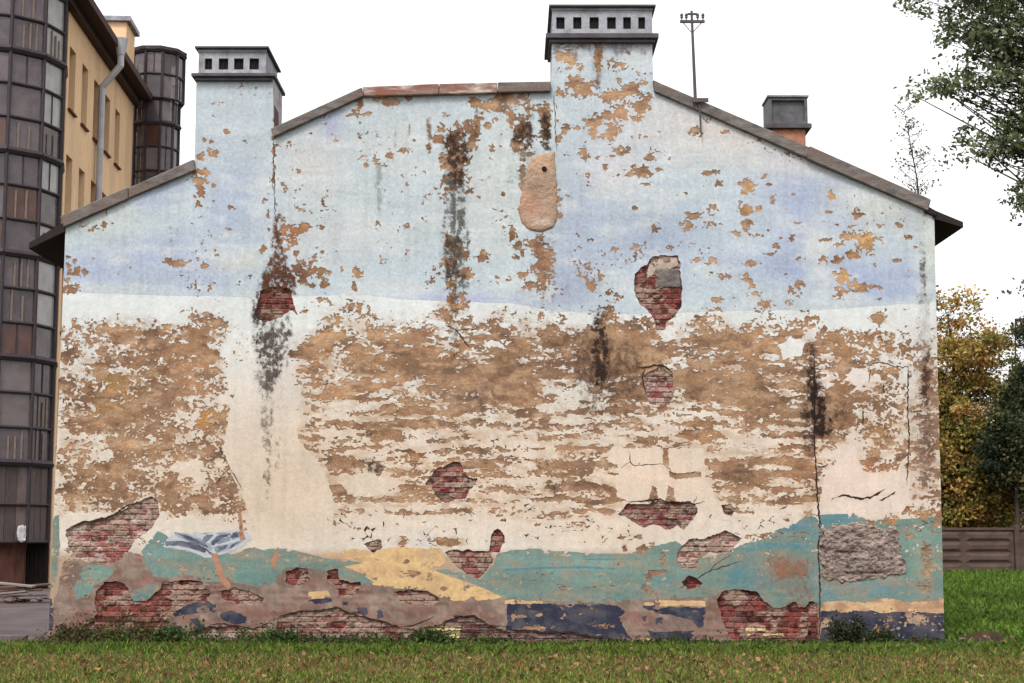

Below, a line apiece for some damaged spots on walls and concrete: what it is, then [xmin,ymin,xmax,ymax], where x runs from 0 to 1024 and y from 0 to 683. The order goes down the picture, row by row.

peeling [687,116,712,140]
water stain [442,132,470,363]
peeling [54,137,264,639]
peeling [255,136,941,607]
water stain [801,344,845,455]
crack [813,343,922,636]
flaking render [717,589,834,642]